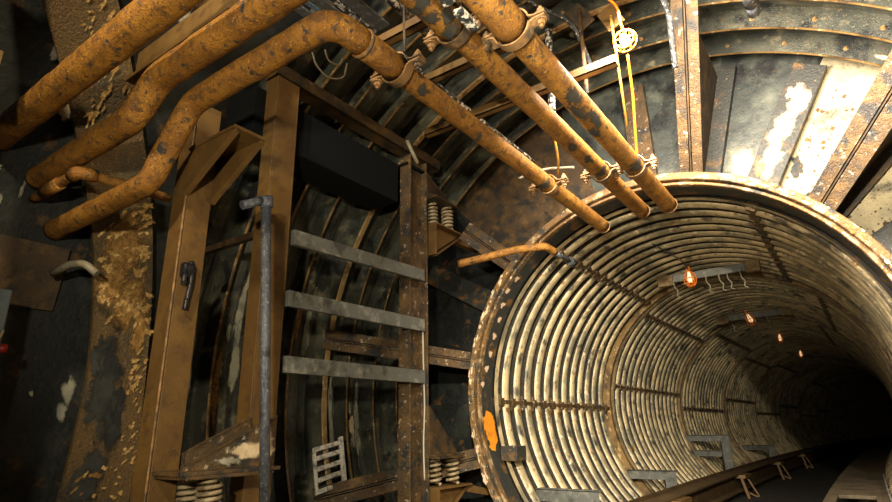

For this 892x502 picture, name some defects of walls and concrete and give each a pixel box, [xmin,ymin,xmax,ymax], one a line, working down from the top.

peeling [741,83,869,241]
leakage [64,319,126,502]